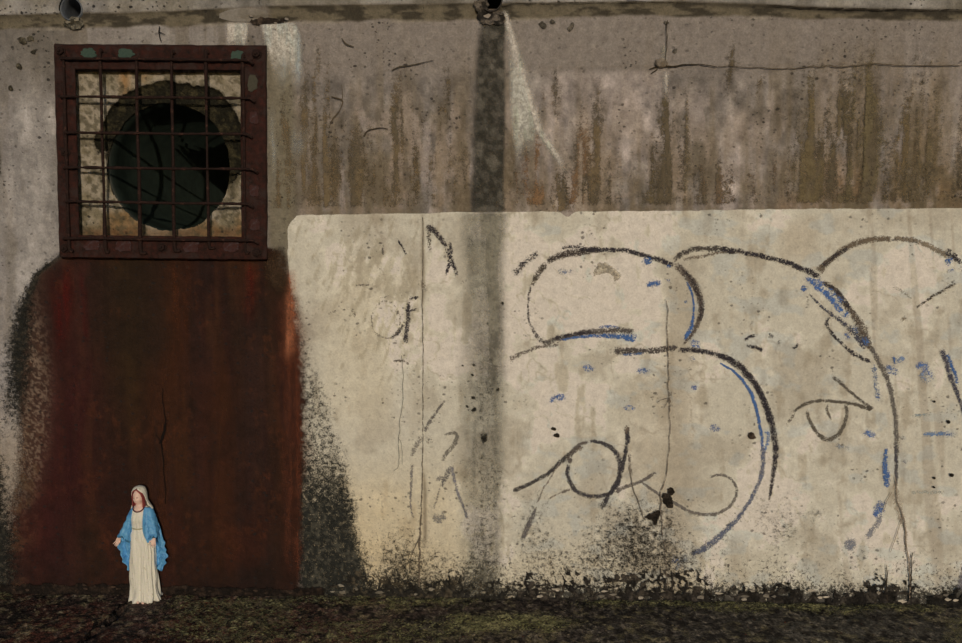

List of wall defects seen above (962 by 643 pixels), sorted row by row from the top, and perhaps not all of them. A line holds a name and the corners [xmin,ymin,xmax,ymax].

damp [642,75,735,205]
damp [748,53,942,203]
damp [1,256,58,436]
rust [2,240,308,590]
damp [298,14,622,599]
damp [0,455,19,587]
damp [515,495,701,601]